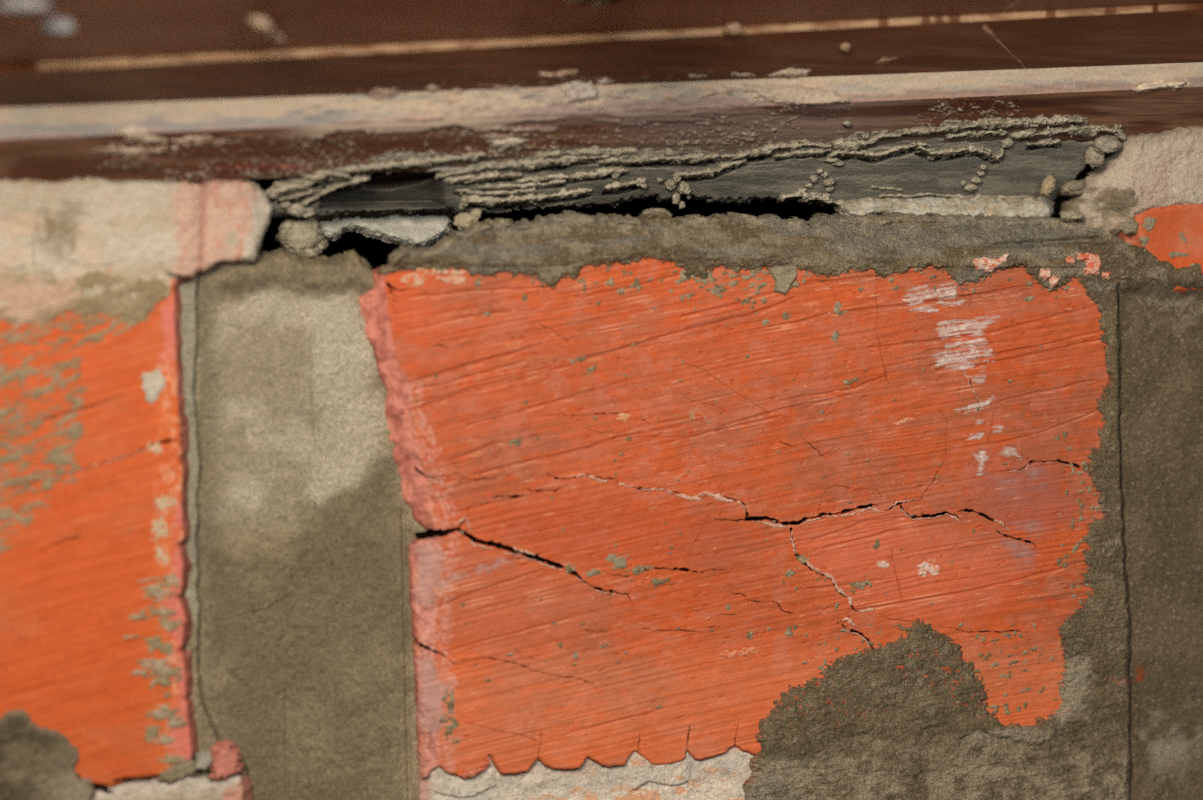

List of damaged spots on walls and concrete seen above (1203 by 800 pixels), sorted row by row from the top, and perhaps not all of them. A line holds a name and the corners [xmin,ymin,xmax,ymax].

peeling [145,439,164,455]
crack [983,460,1080,474]
peeling [149,492,177,565]
crack [414,412,1037,650]
crack [414,639,595,684]